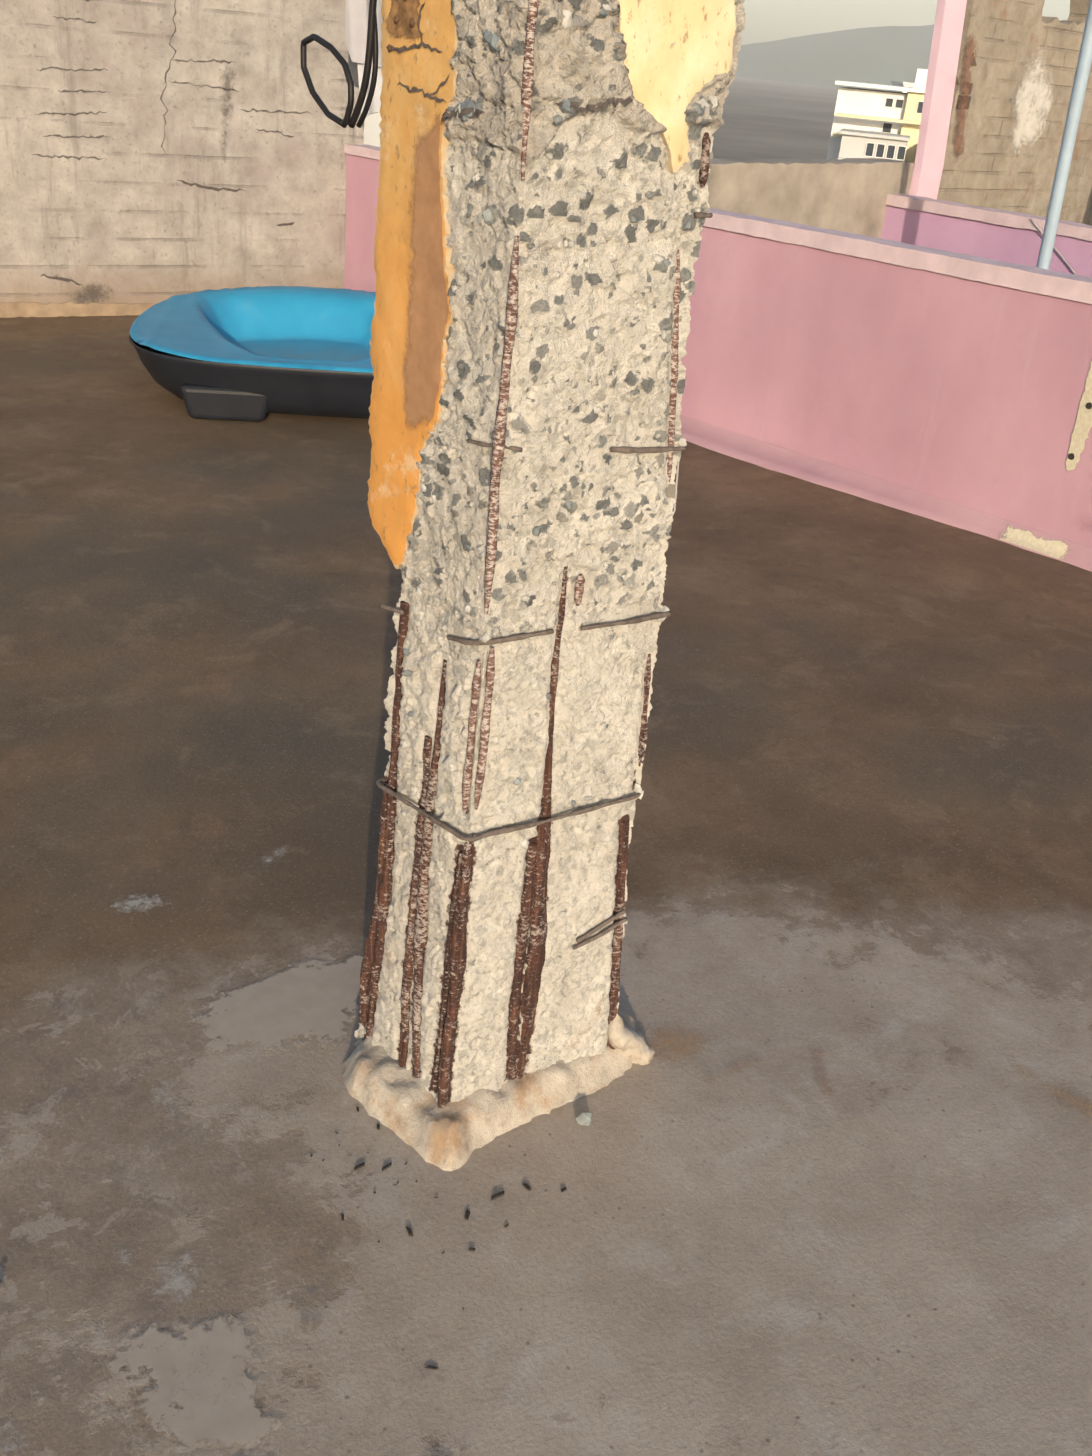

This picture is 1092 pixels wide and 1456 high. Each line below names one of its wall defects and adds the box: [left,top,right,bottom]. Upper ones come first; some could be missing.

crack [33,67,111,160]
crack [160,0,312,192]
crack [386,3,485,121]
crack [554,96,633,113]
leakage [1013,61,1051,148]
crack [40,274,82,285]
peeling [1066,361,1092,471]
spalling [189,0,746,1103]
peeling [999,525,1068,560]